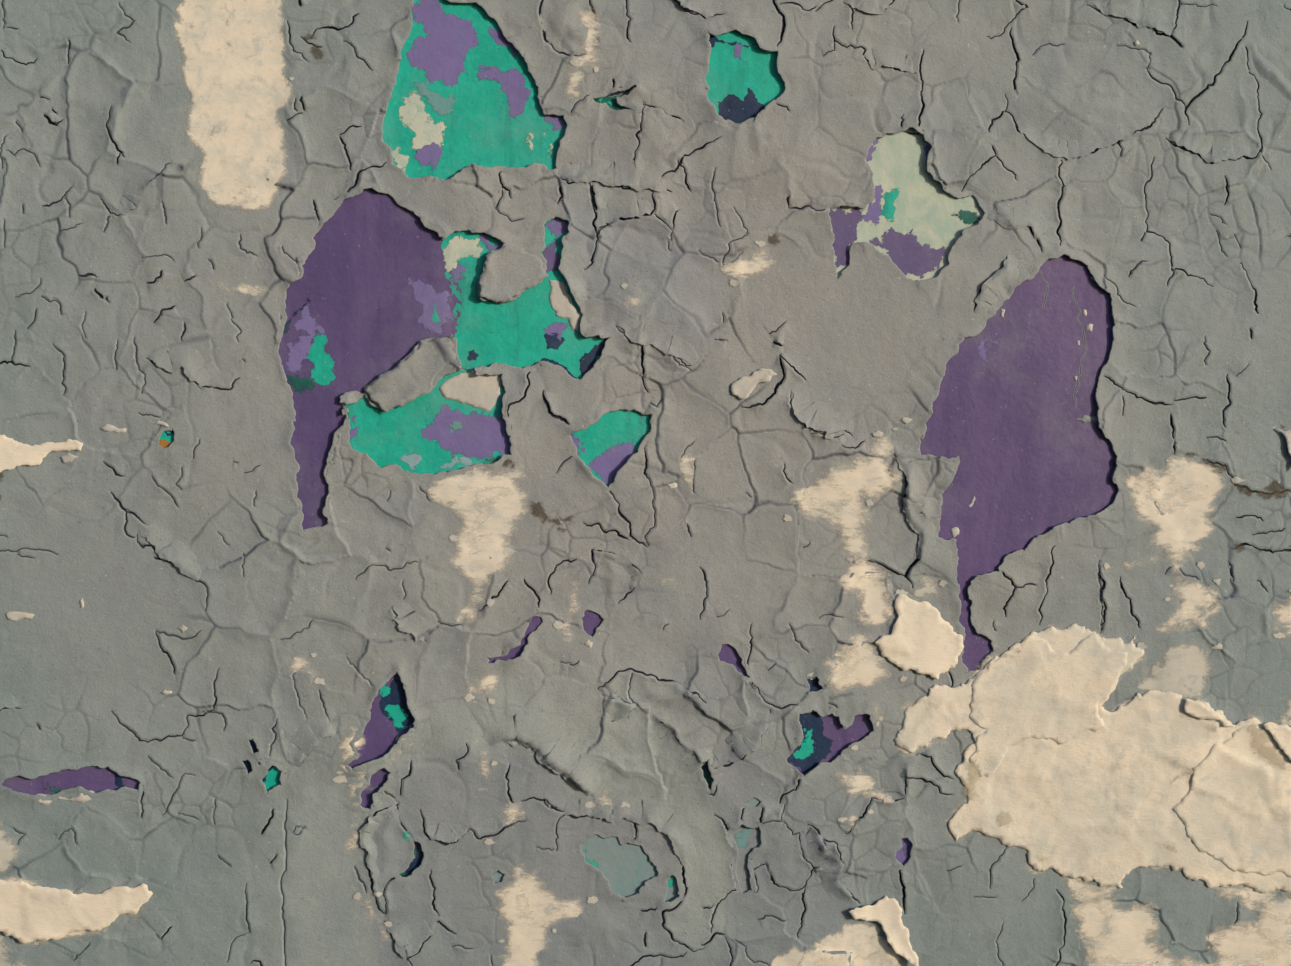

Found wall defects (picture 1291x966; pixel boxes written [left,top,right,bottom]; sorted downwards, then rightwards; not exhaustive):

crack [0,160,300,420]
peeling [273,0,699,535]
crack [555,78,751,272]
peeling [677,0,790,128]
peeling [824,122,1123,677]
crack [770,0,1291,594]
peeling [0,761,146,805]
crack [102,438,211,676]
crack [109,667,306,966]
peeling [237,667,468,966]
crack [352,439,956,966]
peeling [782,672,878,781]